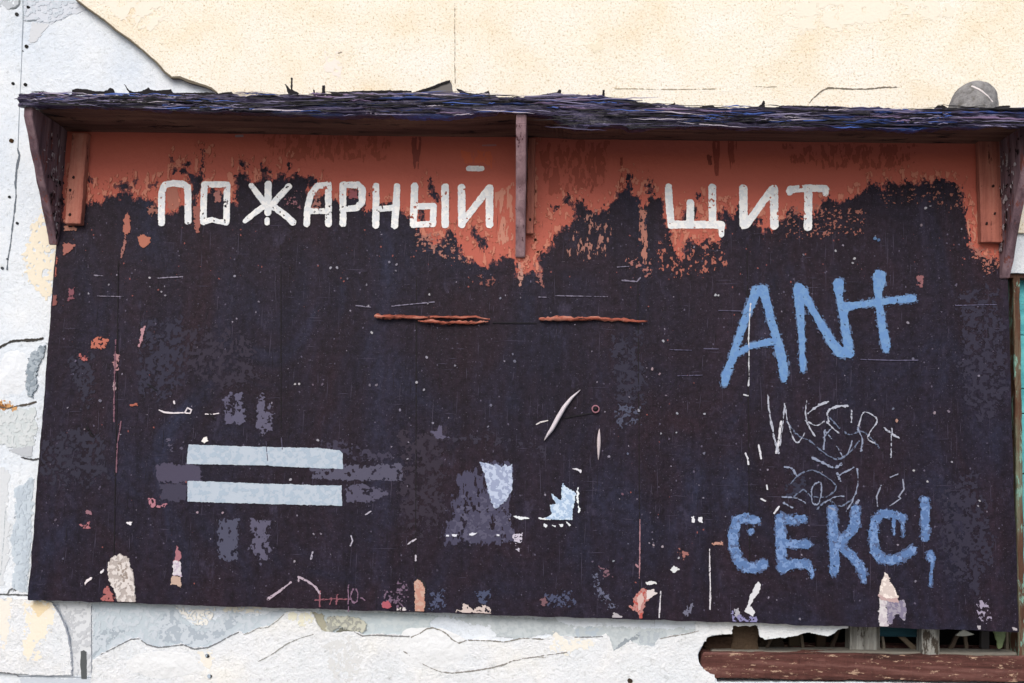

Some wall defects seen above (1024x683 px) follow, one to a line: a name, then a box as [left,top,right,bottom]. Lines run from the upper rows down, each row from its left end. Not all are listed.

peeling [0,0,86,45]
peeling [21,131,1021,434]
peeling [0,343,111,593]
peeling [170,546,182,587]